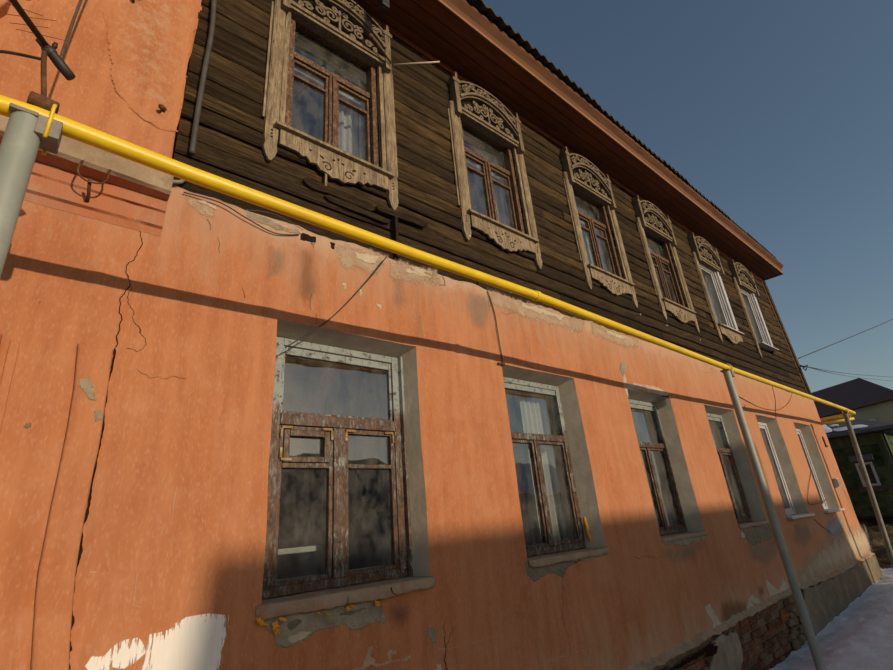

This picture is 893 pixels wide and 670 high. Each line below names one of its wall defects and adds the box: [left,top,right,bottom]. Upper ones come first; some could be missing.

peeling [330,242,440,286]
peeling [489,290,638,347]
spalling [78,378,103,422]
spalling [620,362,669,398]
crack [69,231,186,670]
spalling [525,553,608,582]
spalling [264,601,385,648]
flaking render [660,579,807,670]